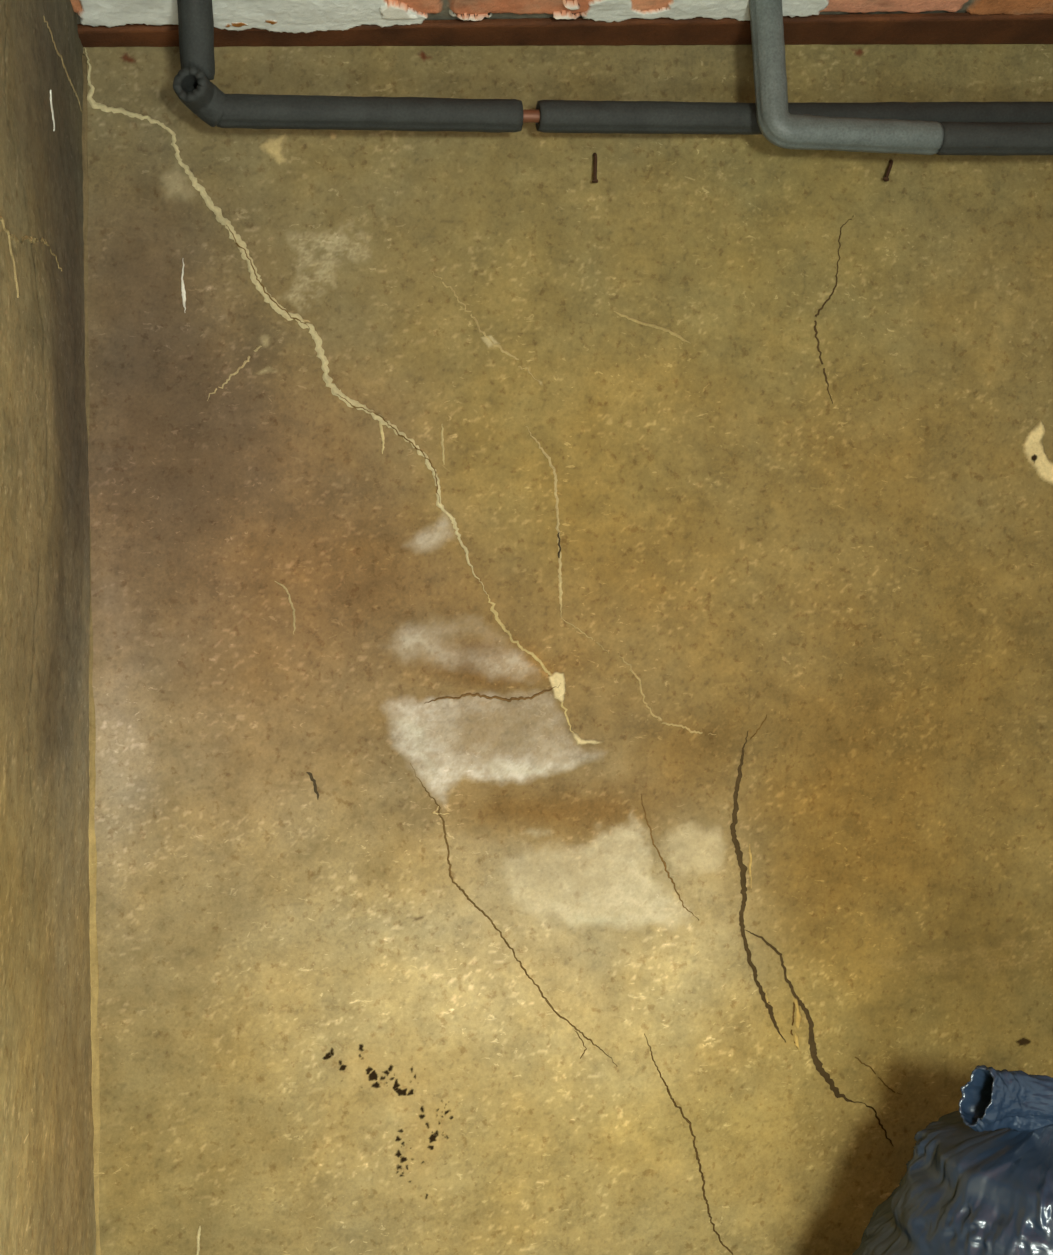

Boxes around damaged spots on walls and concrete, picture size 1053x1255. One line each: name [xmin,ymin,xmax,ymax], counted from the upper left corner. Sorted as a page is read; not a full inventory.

peeling [77,0,178,28]
peeling [212,0,428,34]
peeling [449,10,492,21]
peeling [553,0,750,23]
peeling [782,0,830,18]
crack [43,16,574,734]
water stain [400,505,461,556]
water stain [375,611,730,937]
crack [526,426,902,1147]
crack [410,763,617,1066]
crack [644,1034,733,1255]